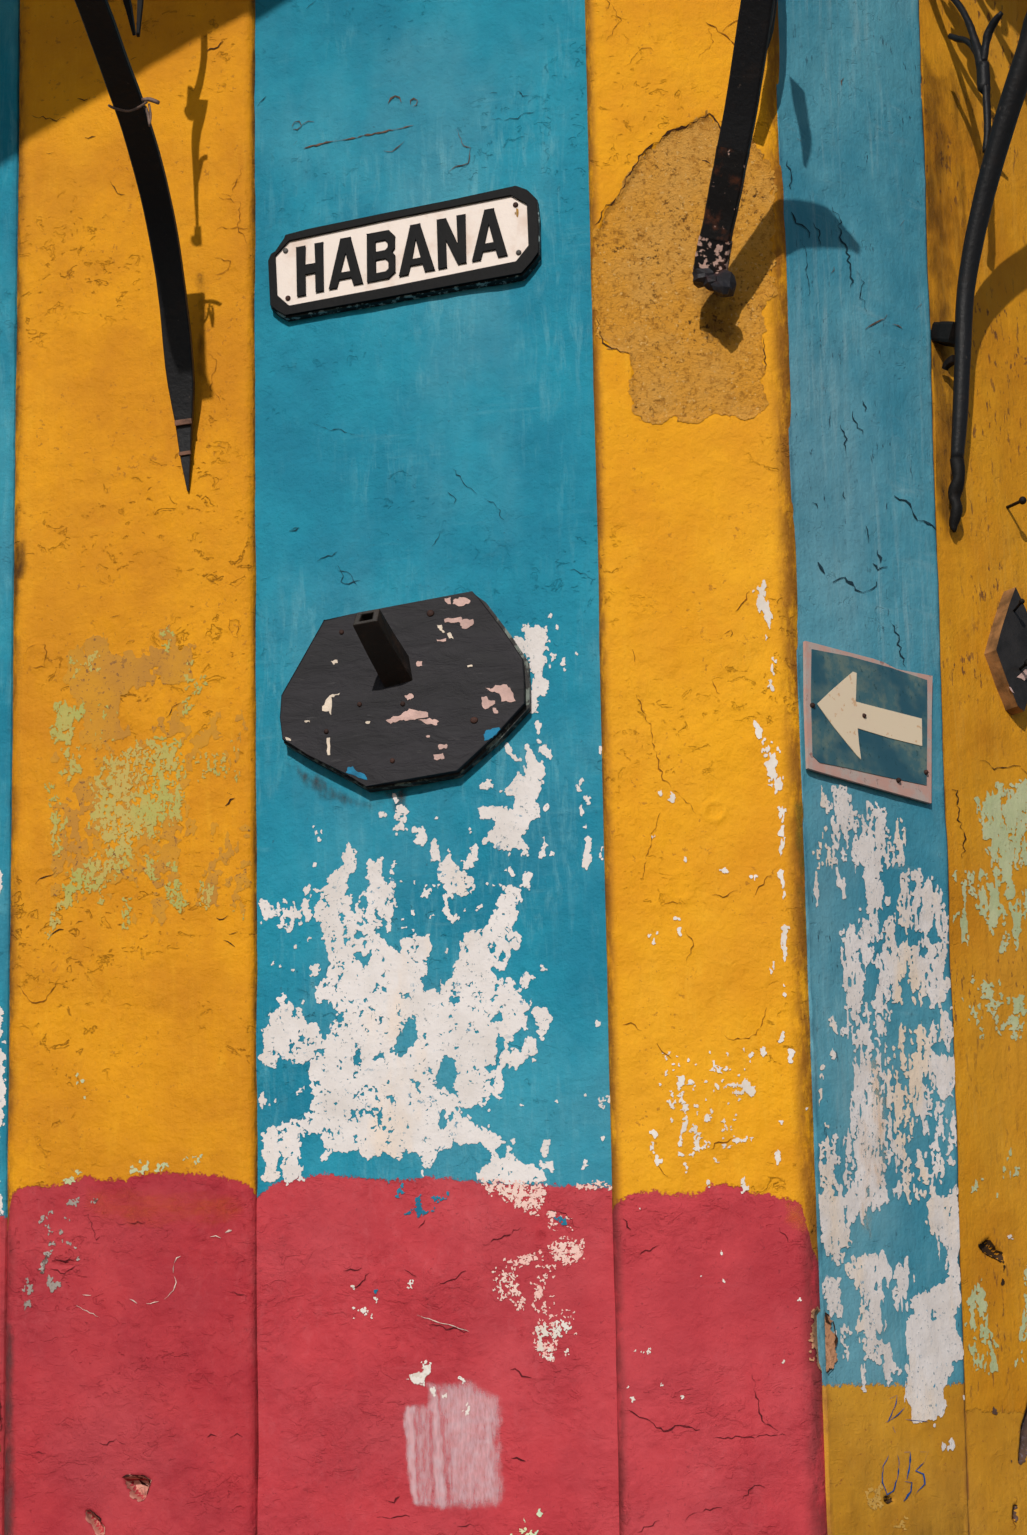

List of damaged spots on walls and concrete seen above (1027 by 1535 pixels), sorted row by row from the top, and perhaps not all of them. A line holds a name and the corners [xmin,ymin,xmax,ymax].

spalling [591,110,778,424]
crack [840,402,872,460]
crack [813,491,884,593]
crack [894,495,936,529]
peeling [437,597,474,642]
crack [892,624,906,667]
peeling [575,777,603,870]
spalling [753,720,787,899]
peeling [44,613,578,1218]
spalling [649,1031,795,1173]
peeling [797,778,1027,1451]
spalling [408,1360,447,1398]